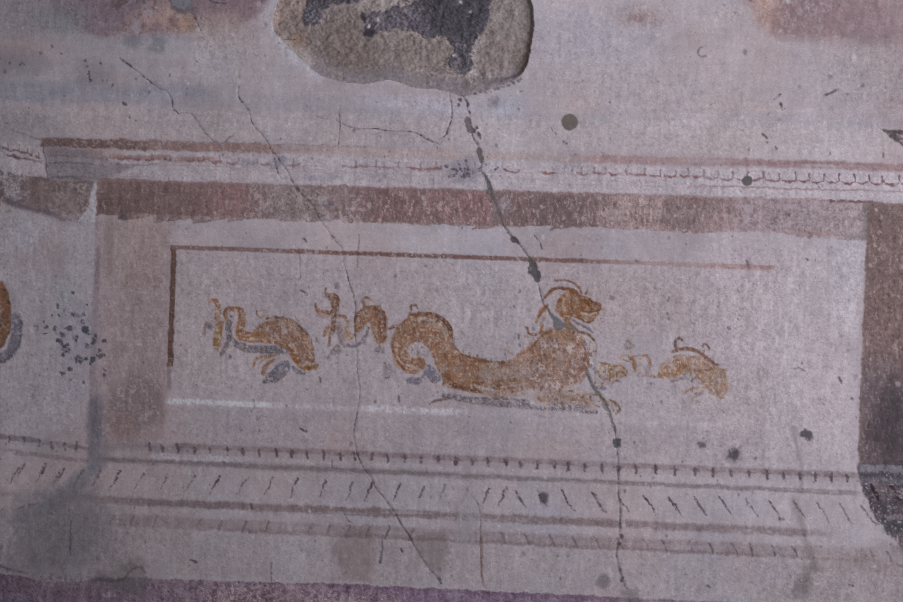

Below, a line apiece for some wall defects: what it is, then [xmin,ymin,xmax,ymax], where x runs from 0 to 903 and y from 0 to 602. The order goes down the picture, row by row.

flaking render [273,0,535,97]
crack [409,98,493,196]
crack [502,223,579,333]
crack [587,370,625,585]